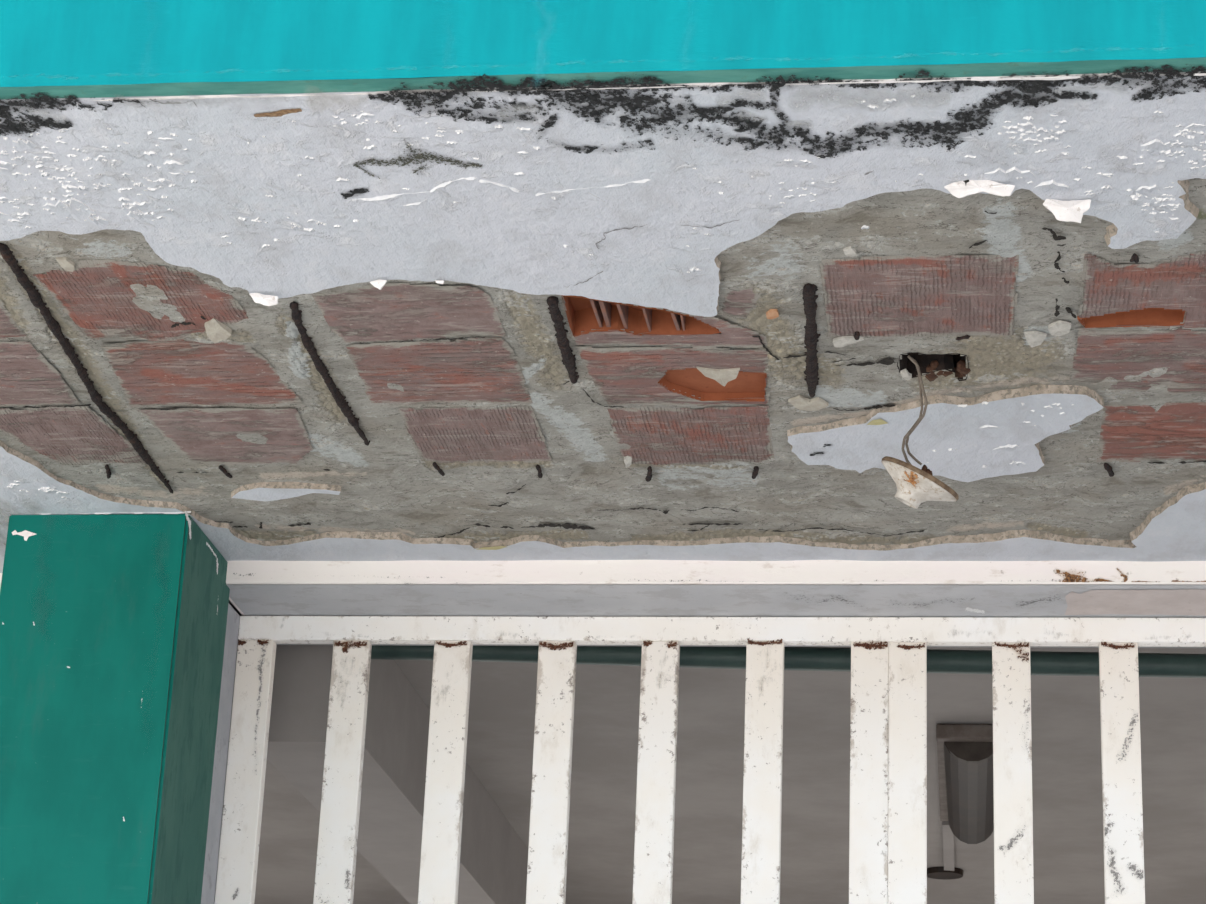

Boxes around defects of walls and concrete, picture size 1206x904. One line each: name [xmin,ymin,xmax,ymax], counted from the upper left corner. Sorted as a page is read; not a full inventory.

leakage [0,92,156,140]
leakage [368,64,1206,159]
leakage [341,139,482,199]
spalling [0,178,1206,551]